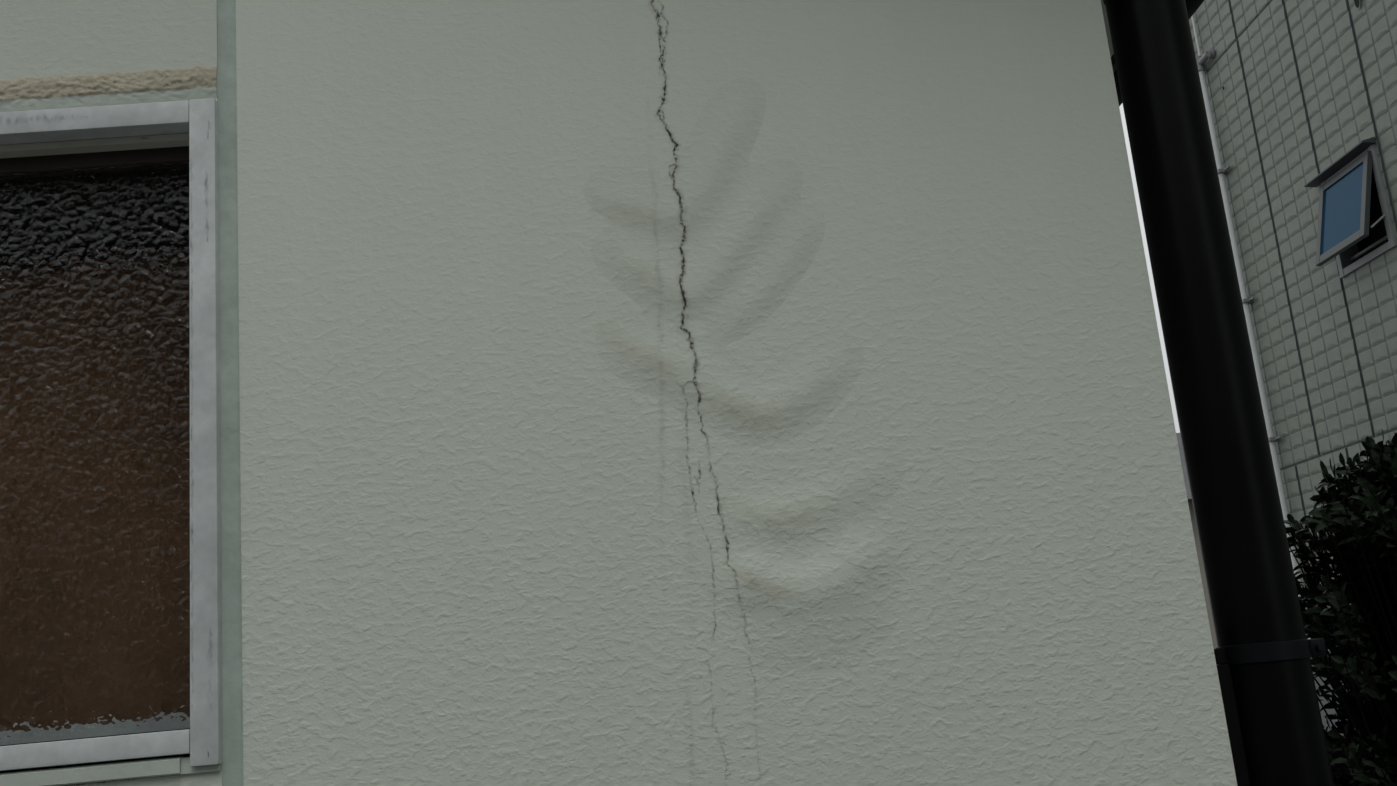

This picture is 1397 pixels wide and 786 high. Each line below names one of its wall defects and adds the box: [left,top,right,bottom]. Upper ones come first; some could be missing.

crack [651,0,705,434]